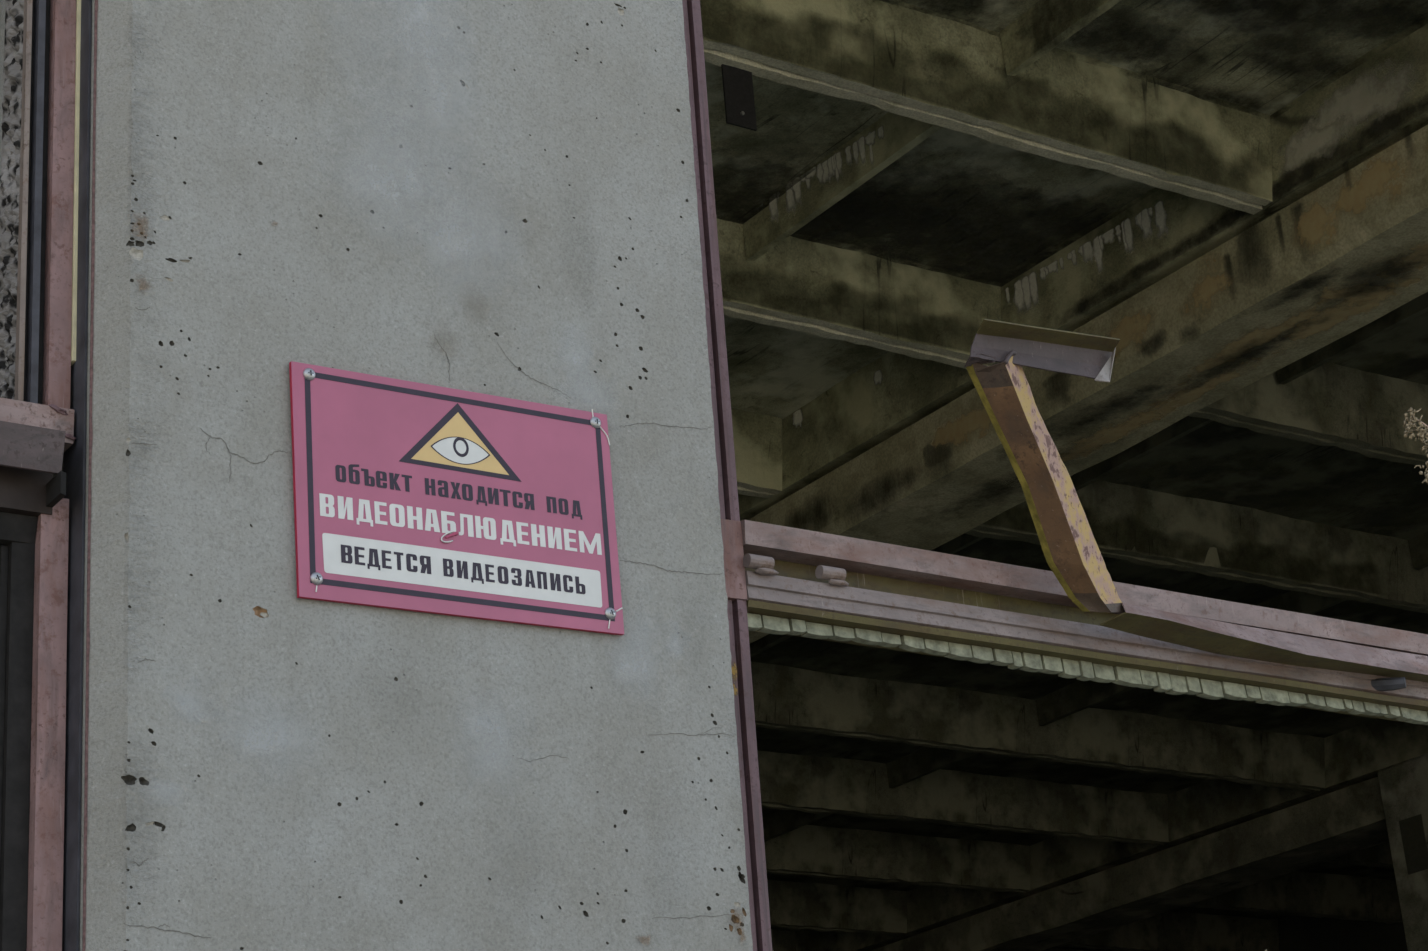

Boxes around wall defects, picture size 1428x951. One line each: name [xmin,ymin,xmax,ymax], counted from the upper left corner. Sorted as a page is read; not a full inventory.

damp [1157,0,1428,79]
damp [700,0,1261,192]
damp [1272,97,1428,243]
damp [714,126,1261,321]
damp [1284,255,1423,299]
crack [497,342,570,398]
damp [1192,334,1292,388]
crack [200,428,288,482]
damp [794,500,826,528]
damp [980,477,1037,533]
crack [620,560,722,575]
damp [1083,509,1380,593]